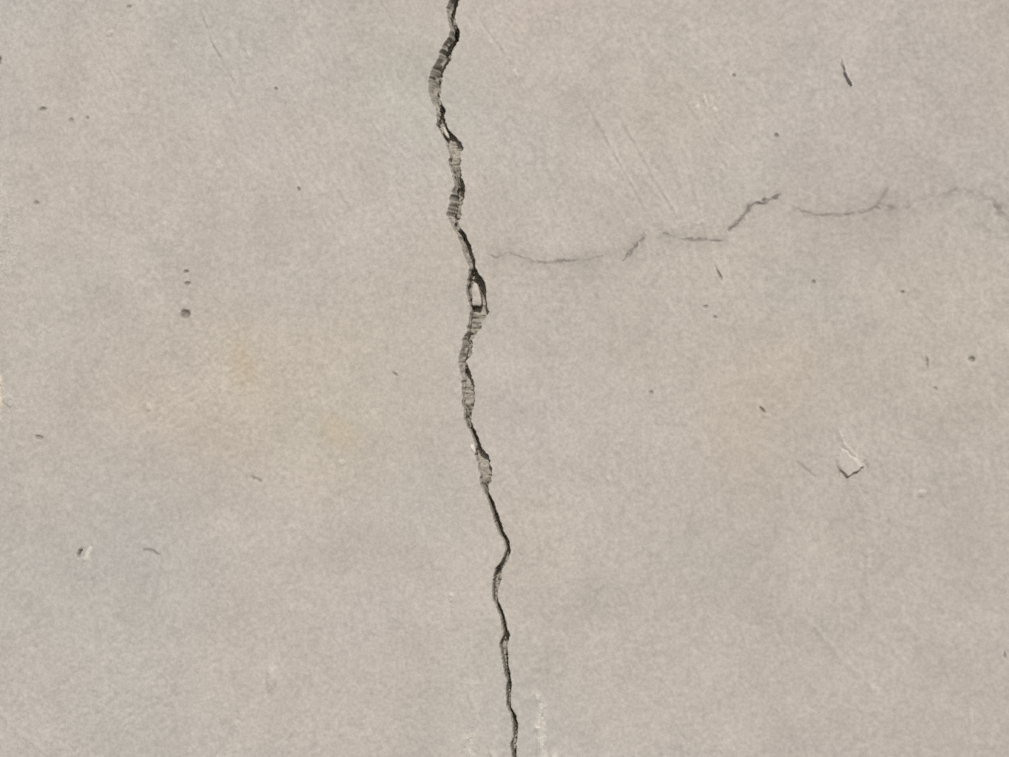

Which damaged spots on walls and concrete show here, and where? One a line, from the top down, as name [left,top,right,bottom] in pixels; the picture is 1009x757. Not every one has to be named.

crack [426,0,1009,757]